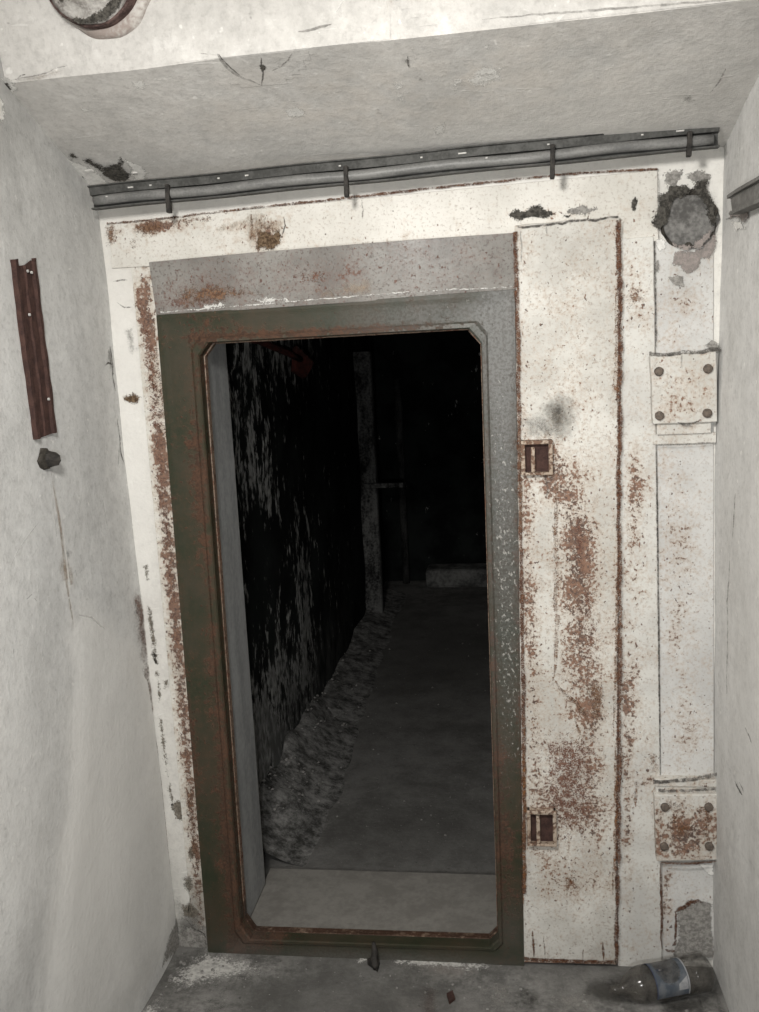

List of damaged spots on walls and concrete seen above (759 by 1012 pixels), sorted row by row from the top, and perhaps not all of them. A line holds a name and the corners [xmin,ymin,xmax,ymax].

crack [201,24,331,88]
spalling [68,154,148,185]
rust [106,168,659,248]
spalling [651,169,749,287]
rust [133,290,202,902]
rust [513,216,641,964]
spalling [665,899,714,959]